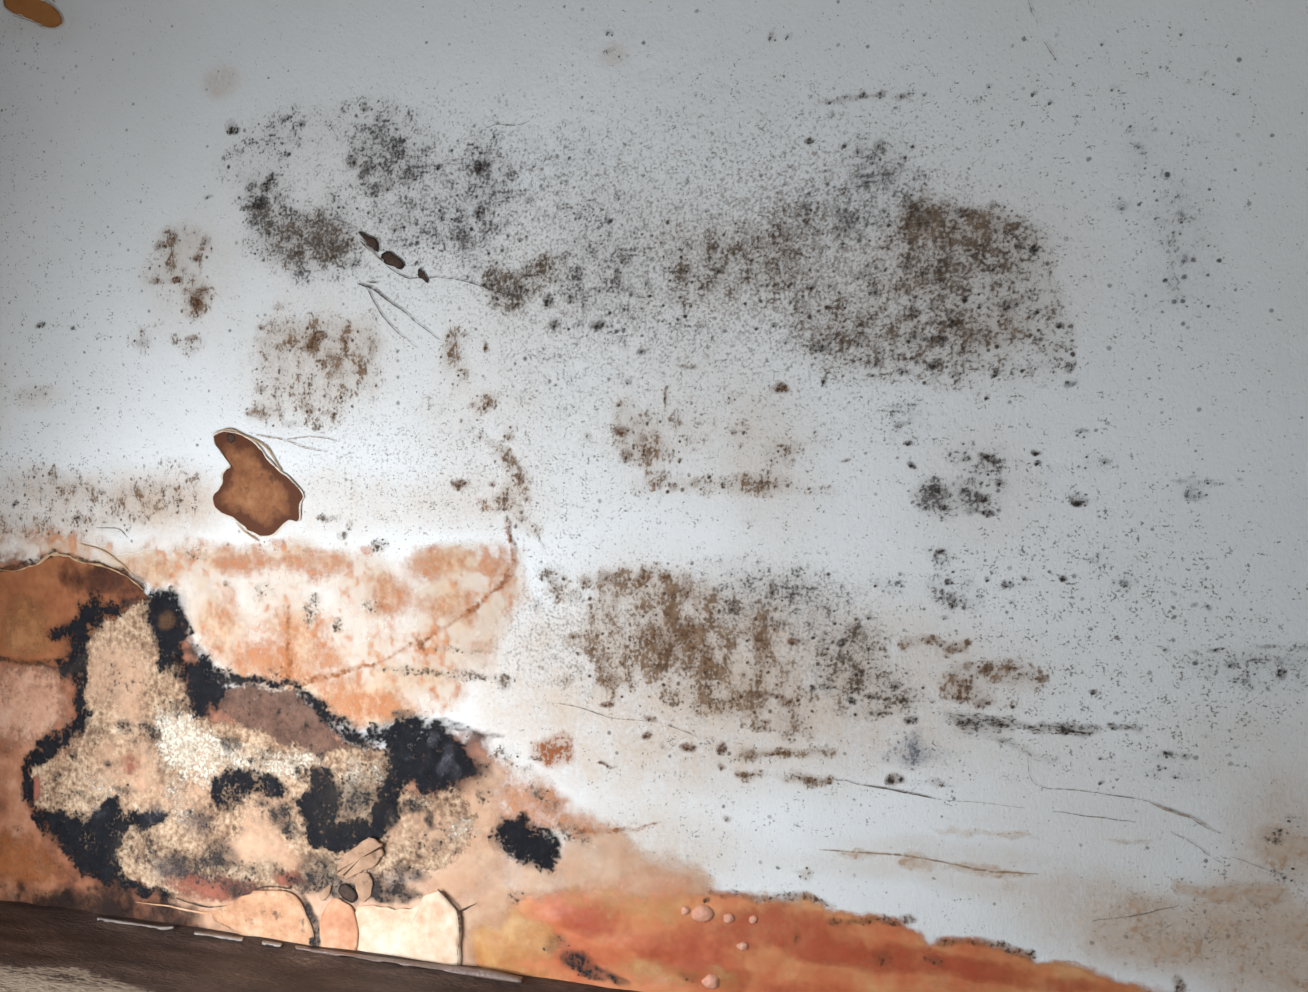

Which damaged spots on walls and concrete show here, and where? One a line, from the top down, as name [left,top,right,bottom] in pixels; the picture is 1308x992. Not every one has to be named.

peeling [3,0,63,28]
water stain [223,97,1076,391]
peeling [212,428,339,541]
water stain [246,306,381,430]
water stain [461,394,497,440]
water stain [610,387,795,498]
peeling [0,544,148,668]
corrosion [286,609,374,686]
corrosion [458,527,516,619]
water stain [0,426,1151,992]
water stain [1192,646,1301,689]
peeling [212,837,462,965]